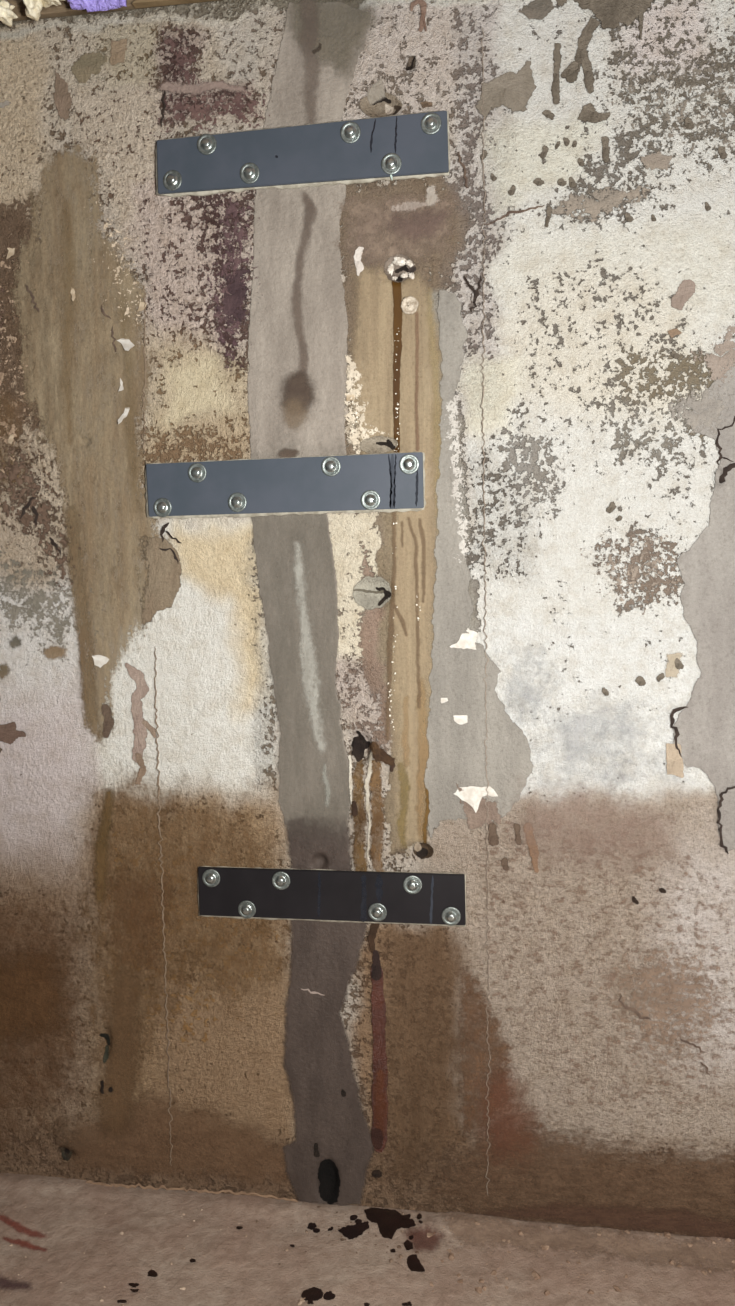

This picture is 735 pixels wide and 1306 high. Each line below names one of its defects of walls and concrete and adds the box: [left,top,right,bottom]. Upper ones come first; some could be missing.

peeling [475,0,673,227]
leakage [0,144,170,742]
rust [392,281,419,453]
crack [716,416,735,483]
peeling [125,663,157,785]
peeling [139,536,182,629]
leakage [253,514,352,871]
peeling [413,290,735,1125]
crack [670,706,688,757]
crack [717,786,735,854]
leakage [0,780,735,1272]
rust [368,923,388,1153]